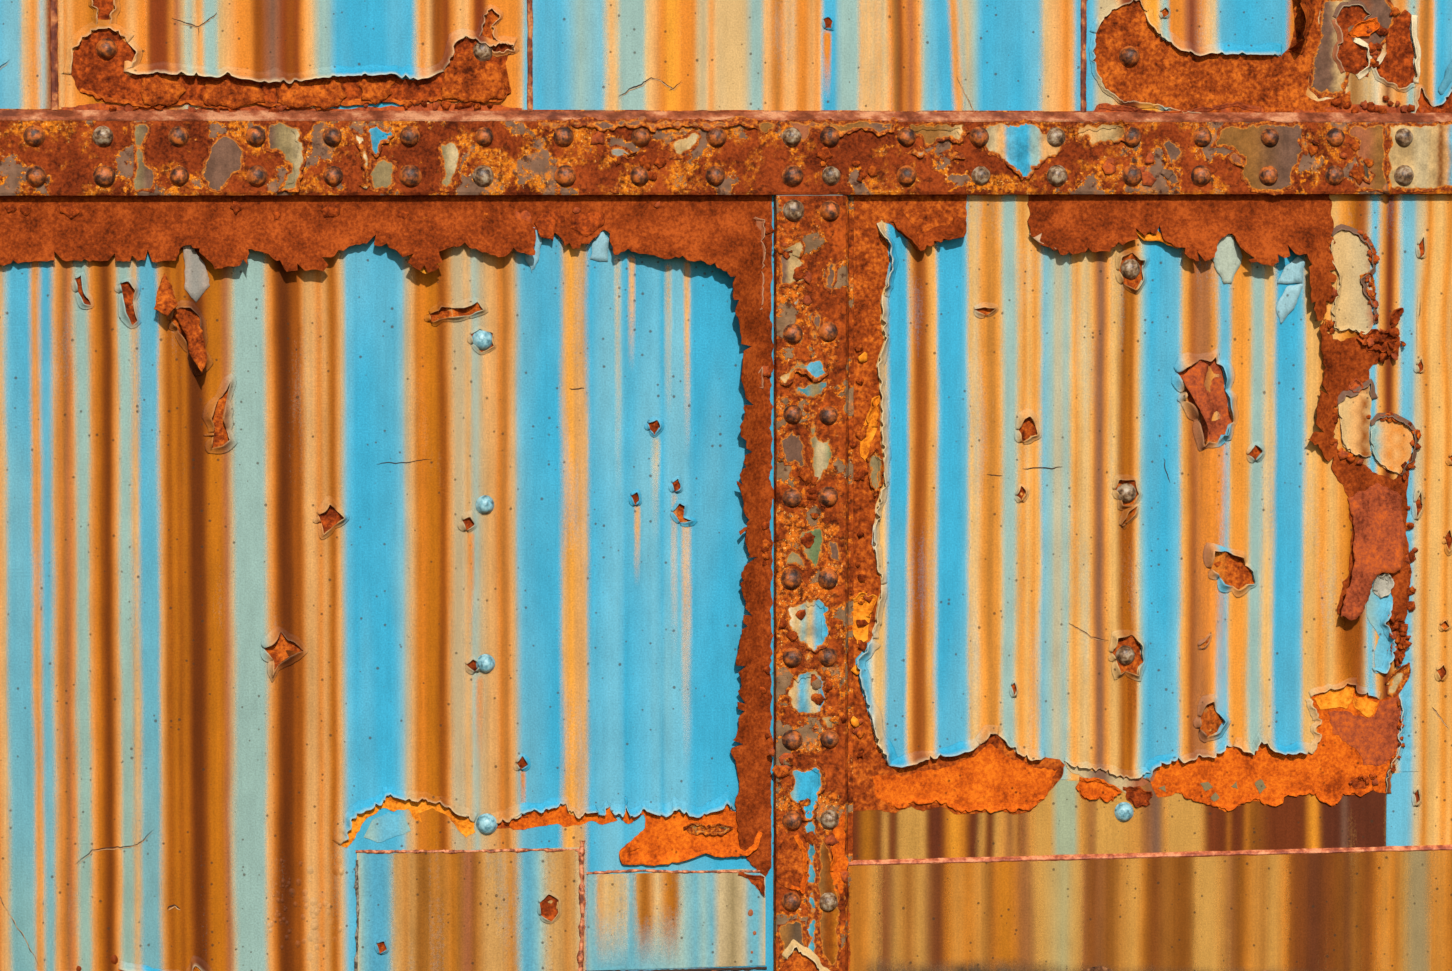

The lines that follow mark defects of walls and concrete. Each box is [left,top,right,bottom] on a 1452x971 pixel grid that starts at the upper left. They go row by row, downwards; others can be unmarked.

corrosion [31,252,142,971]
corrosion [157,247,236,971]
corrosion [265,250,342,971]
peeling [0,0,849,971]
peeling [537,116,970,181]
corrosion [907,241,937,758]
corrosion [849,806,1037,971]
corrosion [968,195,1041,760]
peeling [779,121,1426,815]
peeling [983,0,1452,195]
corrosion [1069,194,1452,971]
peeling [1415,233,1428,259]